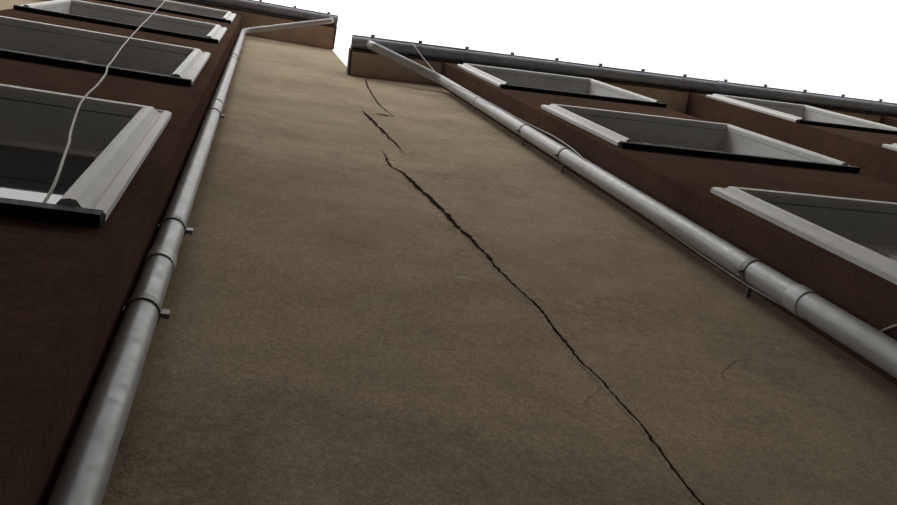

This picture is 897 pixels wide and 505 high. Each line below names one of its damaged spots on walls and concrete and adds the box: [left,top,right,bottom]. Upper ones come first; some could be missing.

crack [361,78,706,505]